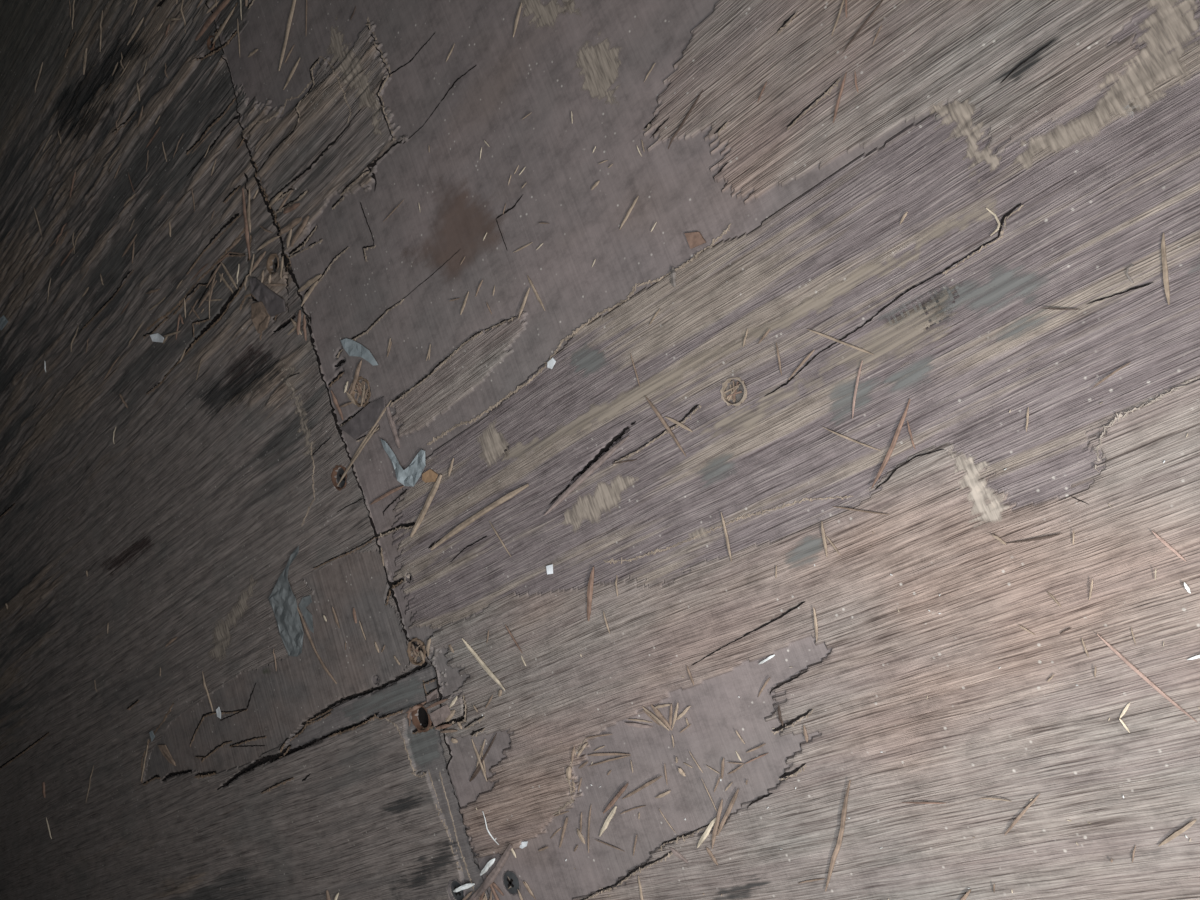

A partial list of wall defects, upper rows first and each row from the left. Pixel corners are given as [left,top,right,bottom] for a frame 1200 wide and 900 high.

crack [142,662,485,794]
peeling [145,0,931,900]